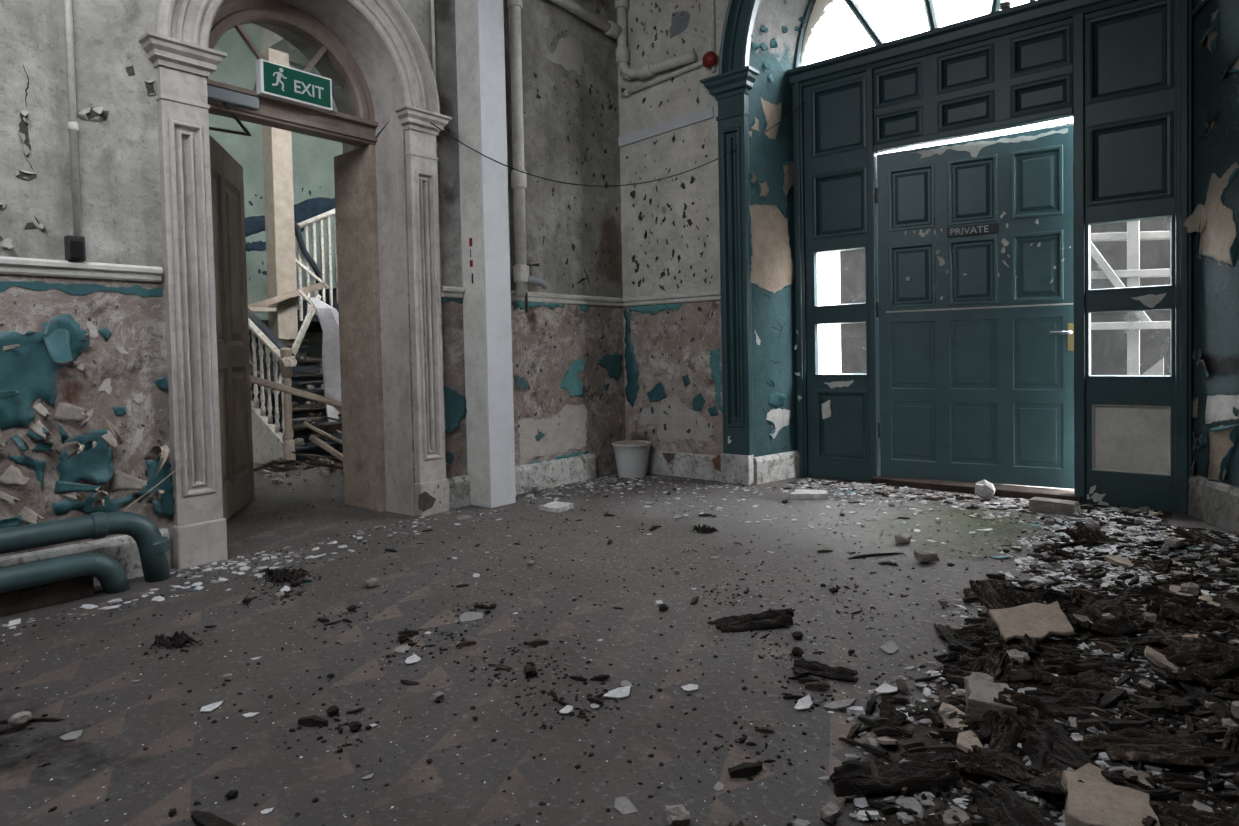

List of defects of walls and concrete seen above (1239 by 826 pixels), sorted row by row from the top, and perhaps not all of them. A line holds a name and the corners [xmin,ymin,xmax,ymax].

peeling [631,0,702,58]
peeling [751,17,807,82]
peeling [15,110,37,180]
peeling [554,79,617,188]
flaking render [748,96,782,140]
peeling [0,236,15,250]
flaking render [748,161,794,294]
flaking render [1183,162,1239,267]
peeling [0,281,163,309]
flaking render [513,140,731,472]
peeling [0,310,175,529]